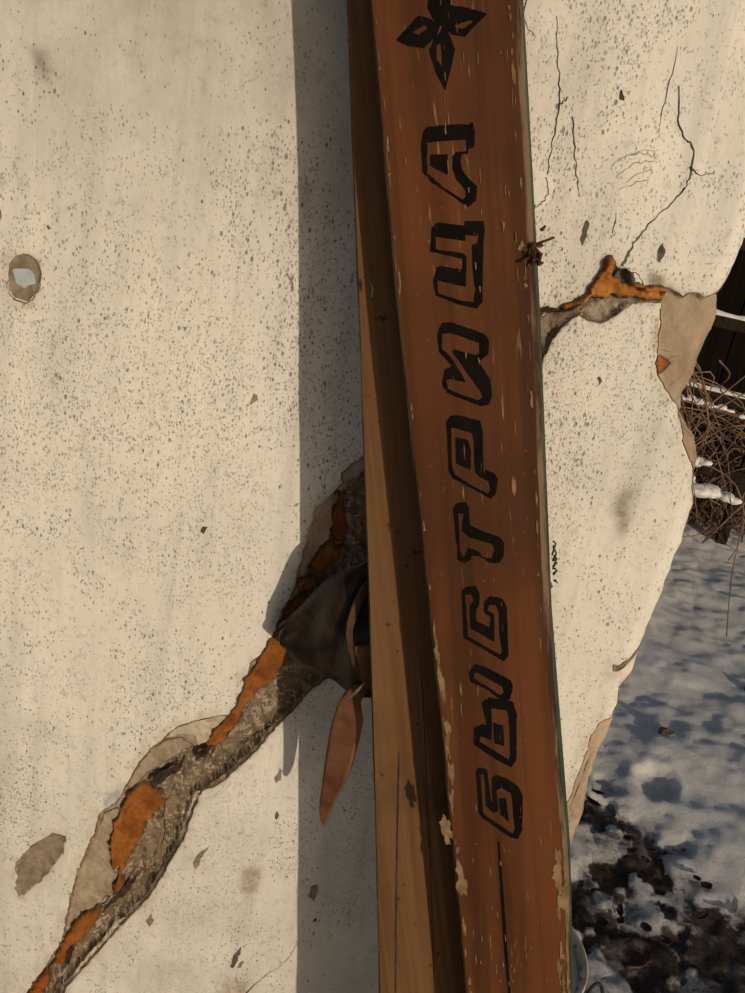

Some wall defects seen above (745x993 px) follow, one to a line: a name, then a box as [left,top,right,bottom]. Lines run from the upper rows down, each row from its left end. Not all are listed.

crack [525,16,580,195]
flaking render [7,254,42,304]
crack [540,48,712,363]
flaking render [656,280,726,504]
crack [27,456,367,993]
flaking render [14,833,66,898]
flaking render [193,848,208,869]
flaking render [551,636,644,993]
flaking render [230,947,244,968]